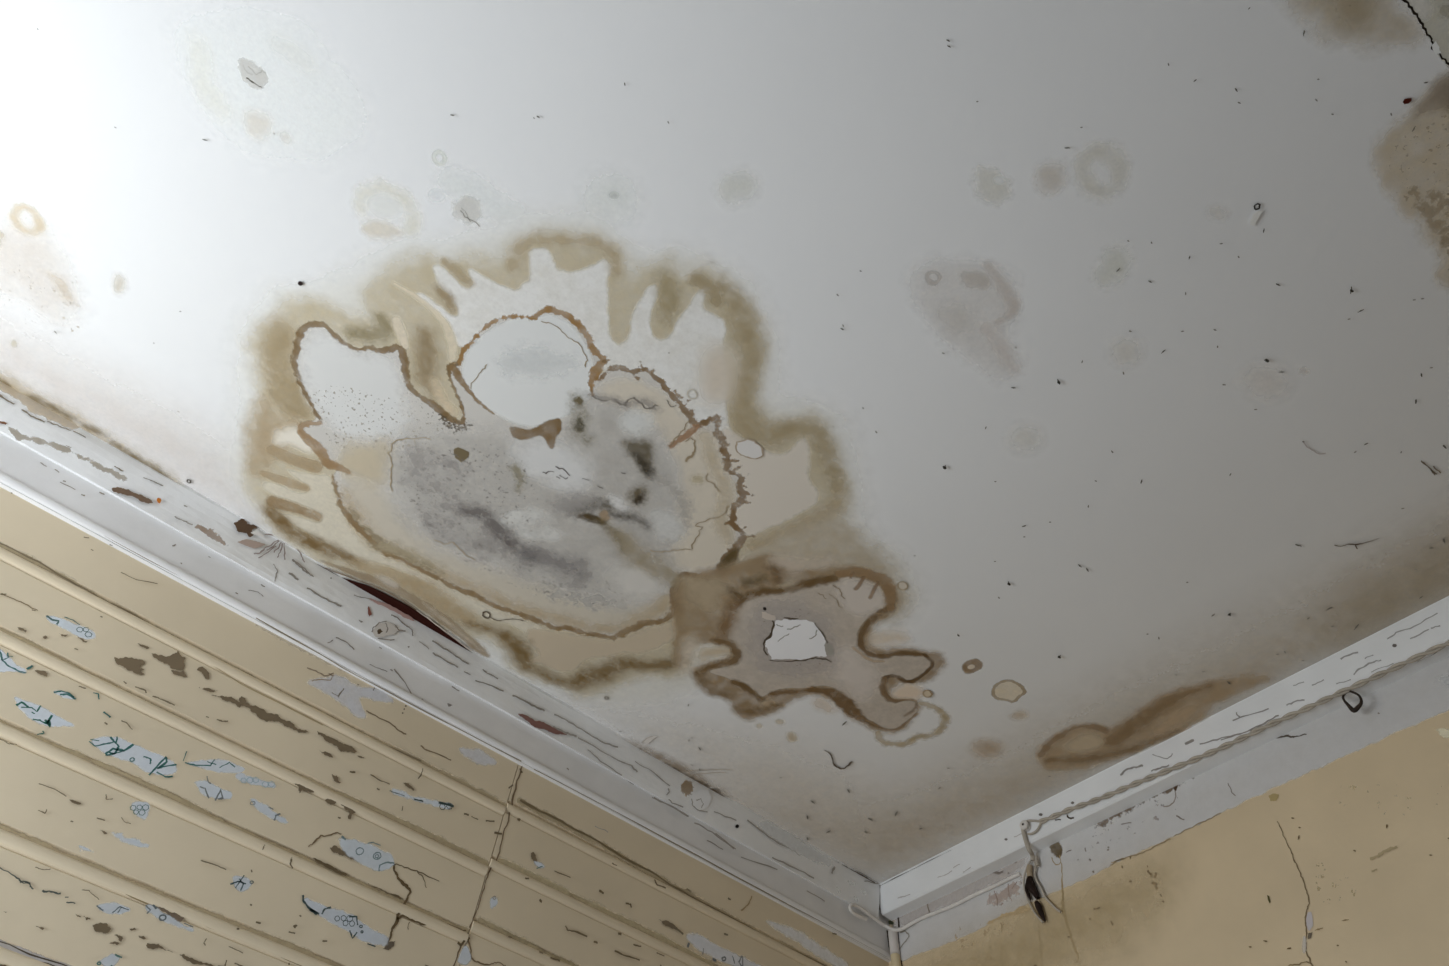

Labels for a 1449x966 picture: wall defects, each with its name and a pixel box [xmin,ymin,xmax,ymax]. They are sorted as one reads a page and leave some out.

crack [1402,0,1449,65]
damp [1290,0,1449,286]
damp [236,150,983,747]
peeling [0,650,76,700]
peeling [114,643,364,783]
spalling [762,612,834,662]
damp [991,680,1027,719]
damp [1037,674,1270,771]
peeling [89,736,288,823]
peeling [77,902,213,966]
peeling [313,836,403,900]
crack [1277,821,1313,966]